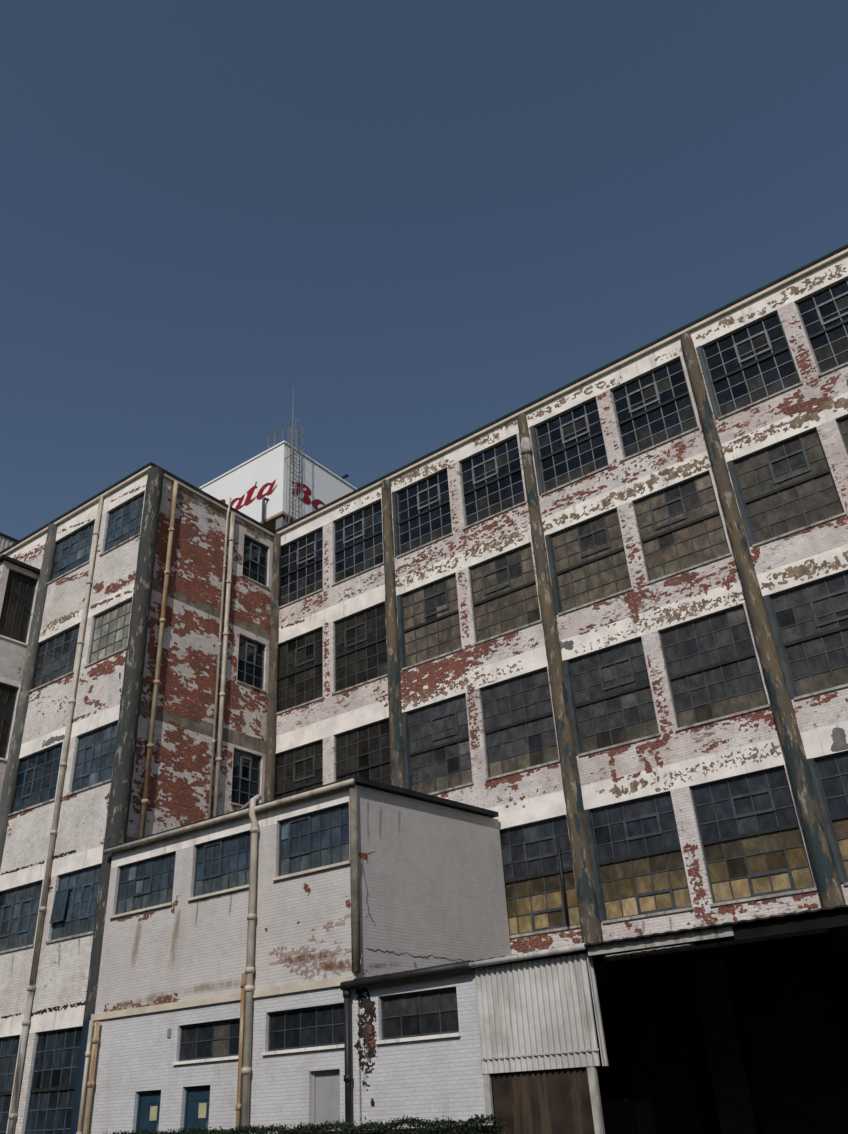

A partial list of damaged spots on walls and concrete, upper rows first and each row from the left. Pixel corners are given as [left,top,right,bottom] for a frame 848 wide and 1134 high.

peeling [696,264,846,339]
peeling [718,316,848,454]
peeling [787,464,848,538]
peeling [128,376,745,835]
peeling [761,551,848,590]
peeling [588,657,782,798]
peeling [794,692,848,713]
spalling [831,727,848,752]
peeling [269,896,363,980]
crack [363,851,473,962]
peeling [510,931,582,953]
peeling [683,843,777,925]